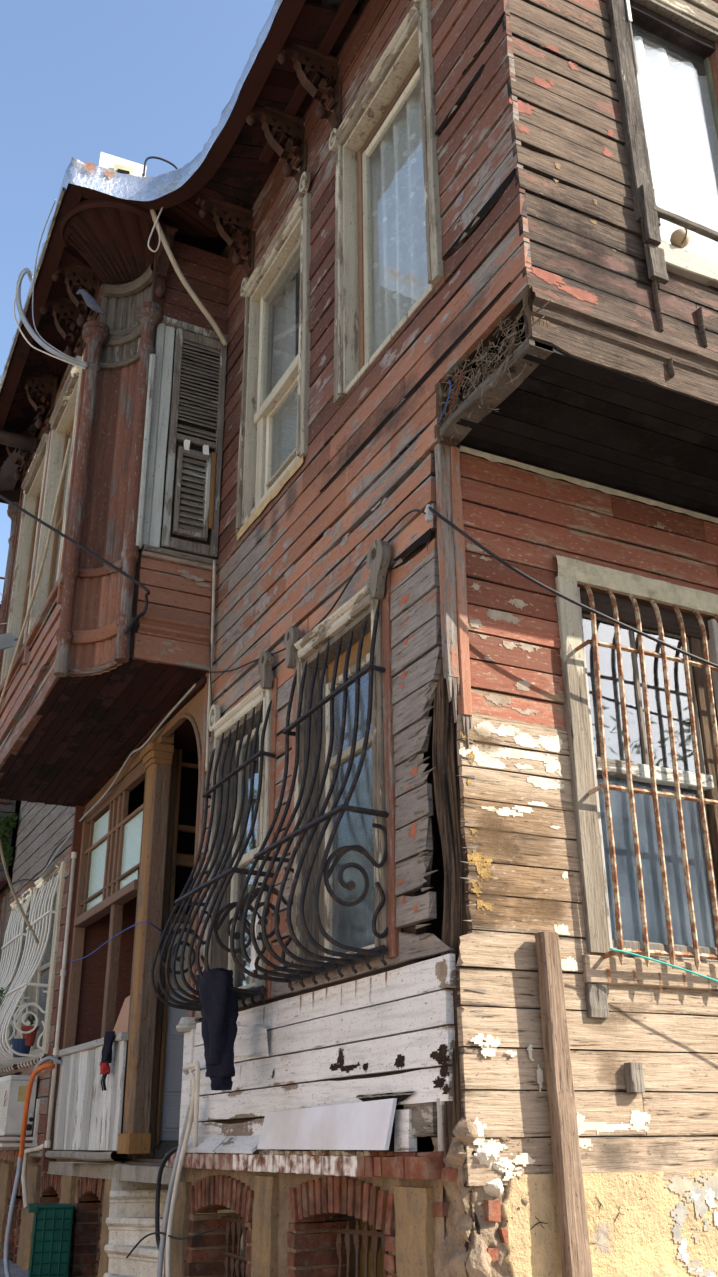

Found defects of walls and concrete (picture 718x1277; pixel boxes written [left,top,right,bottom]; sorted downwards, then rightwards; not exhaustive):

peeling [469,598,542,661]
peeling [459,678,564,817]
flaking render [471,1033,543,1092]
peeling [577,1110,651,1151]
spalling [433,1117,535,1277]
peeling [665,1172,718,1277]